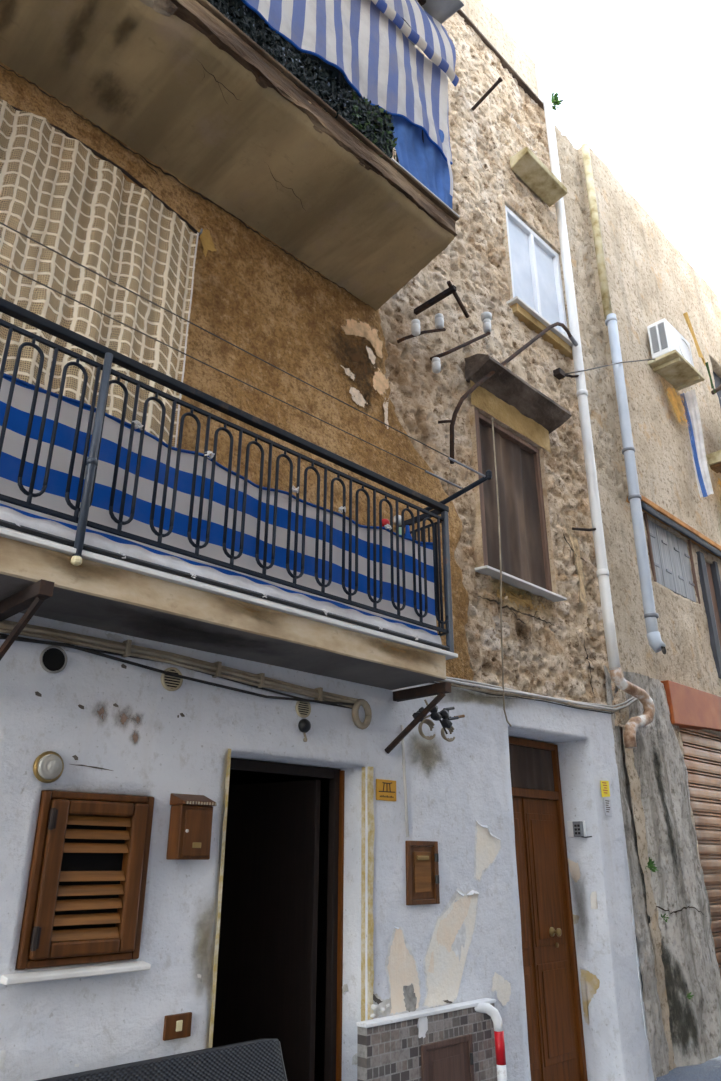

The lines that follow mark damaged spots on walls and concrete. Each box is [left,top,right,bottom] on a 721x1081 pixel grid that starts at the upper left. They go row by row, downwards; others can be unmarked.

spalling [139,0,424,211]
peeling [341,319,389,429]
water stain [654,748,678,873]
peeling [361,766,501,1038]
water stain [636,839,650,924]
peeling [580,969,600,1025]
water stain [654,942,698,1051]